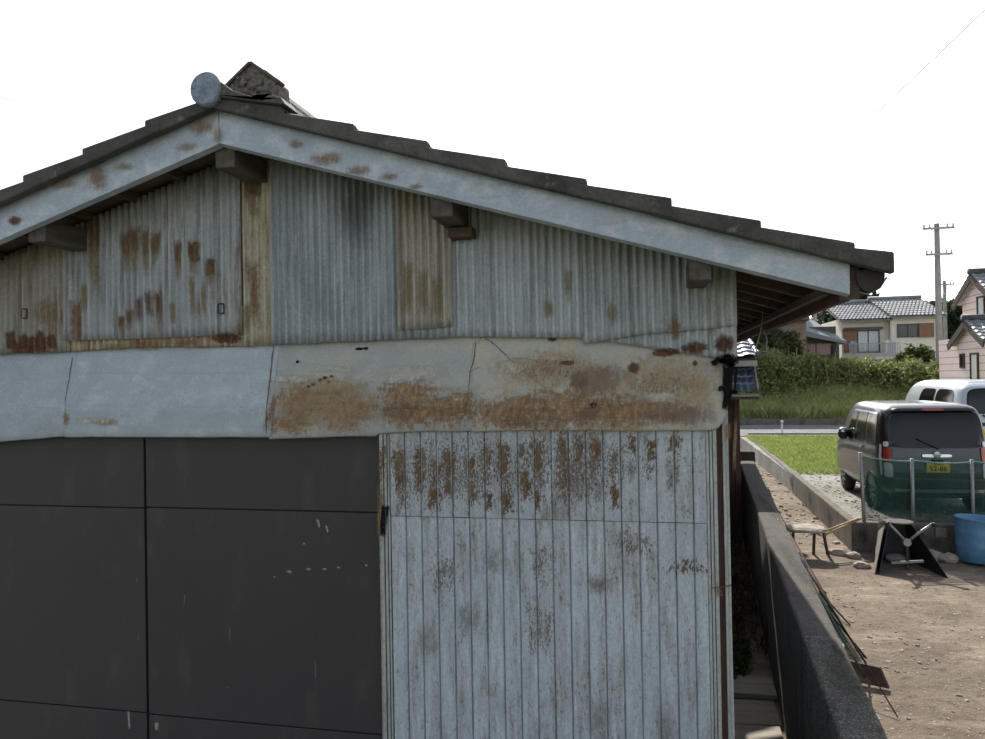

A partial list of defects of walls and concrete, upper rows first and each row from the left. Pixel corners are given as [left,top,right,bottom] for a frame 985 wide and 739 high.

corrosion [123,229,160,270]
corrosion [5,331,58,353]
corrosion [118,292,175,333]
corrosion [174,242,215,310]
corrosion [403,269,442,313]
corrosion [653,301,733,366]
corrosion [267,361,706,536]